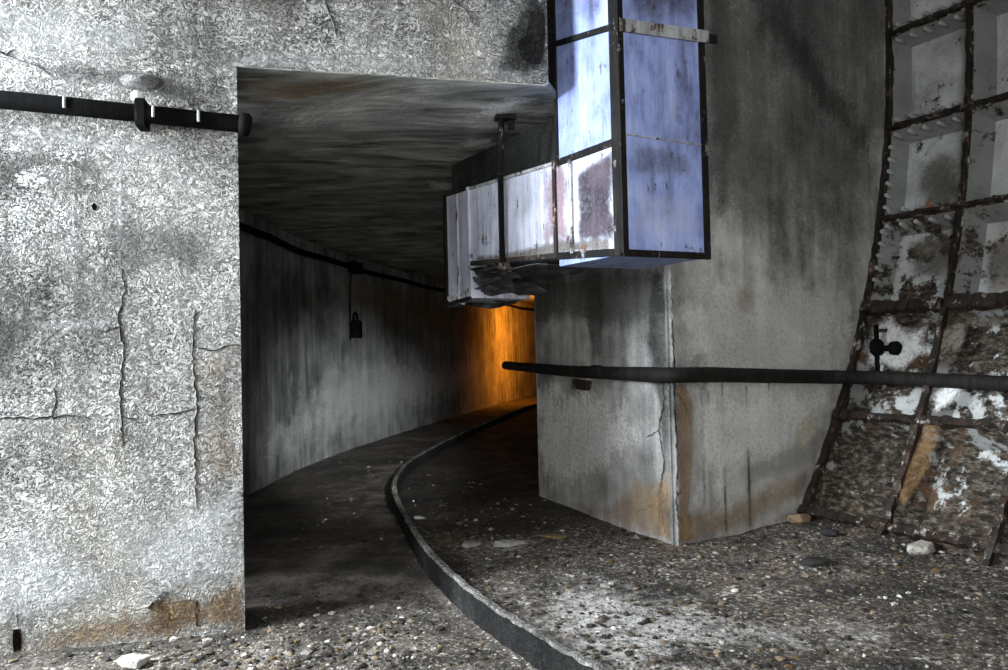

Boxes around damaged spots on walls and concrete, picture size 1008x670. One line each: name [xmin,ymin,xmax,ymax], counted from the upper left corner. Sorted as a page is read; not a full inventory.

water stain [498,0,546,76]
water stain [0,156,47,189]
peeling [921,154,958,204]
peeling [988,240,1008,293]
peeling [872,323,922,366]
rust [939,318,1008,368]
crack [0,388,92,420]
crack [99,269,237,531]
crack [633,278,691,541]
peeling [936,388,958,410]
rust [679,388,693,540]
rust [48,587,241,649]